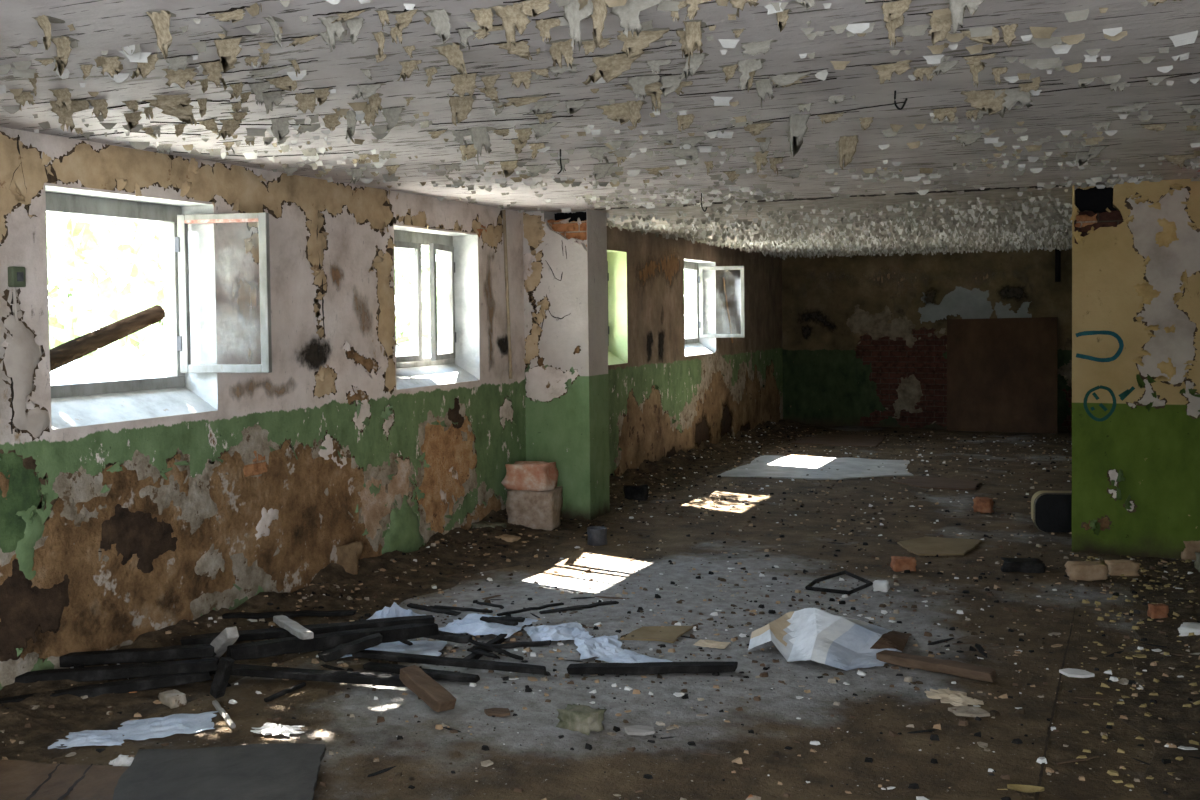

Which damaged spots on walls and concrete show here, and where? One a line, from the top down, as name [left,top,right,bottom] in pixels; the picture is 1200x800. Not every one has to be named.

peeling [0,0,1200,441]
crack [8,377,16,434]
spalling [614,348,783,477]
spalling [0,397,506,687]
peeling [1107,469,1137,513]
peeling [948,706,990,717]